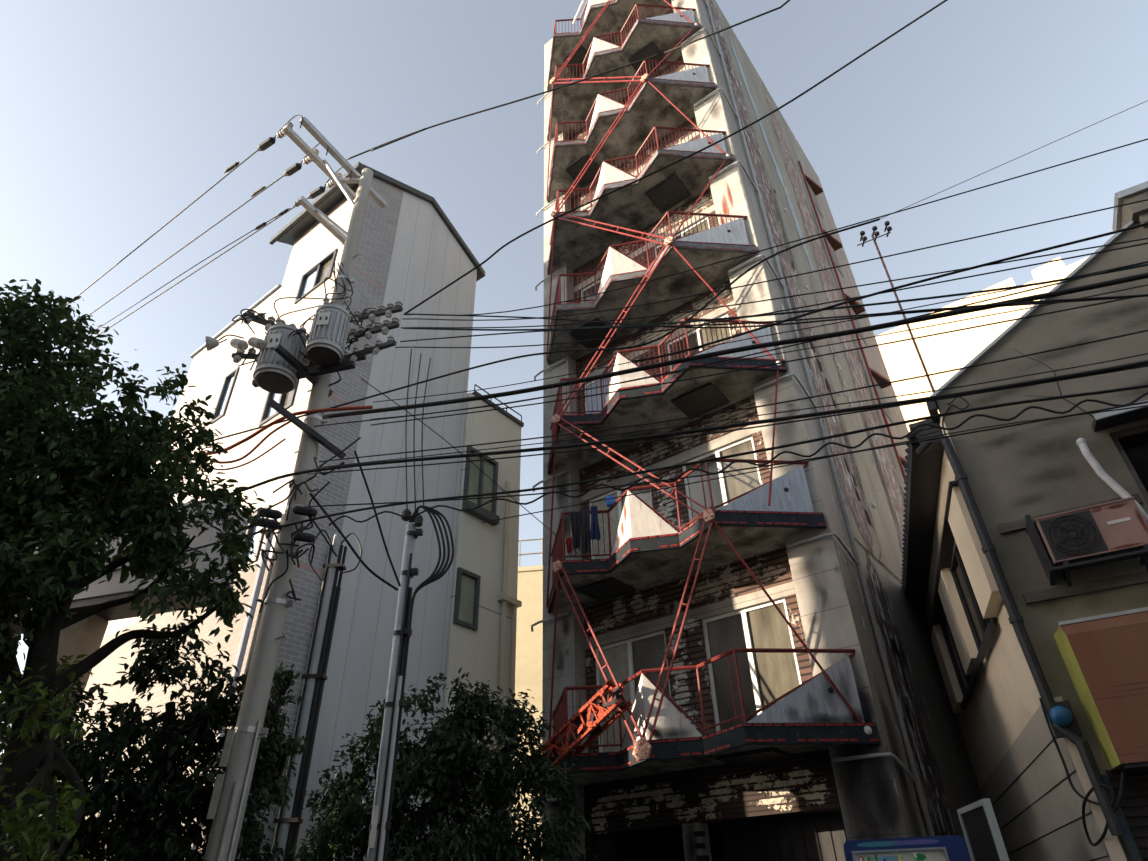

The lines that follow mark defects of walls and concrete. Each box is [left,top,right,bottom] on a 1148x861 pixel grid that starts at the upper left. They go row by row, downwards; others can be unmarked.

peeling [589,588,660,633]
peeling [686,561,789,604]
peeling [662,617,709,728]
peeling [588,767,830,841]